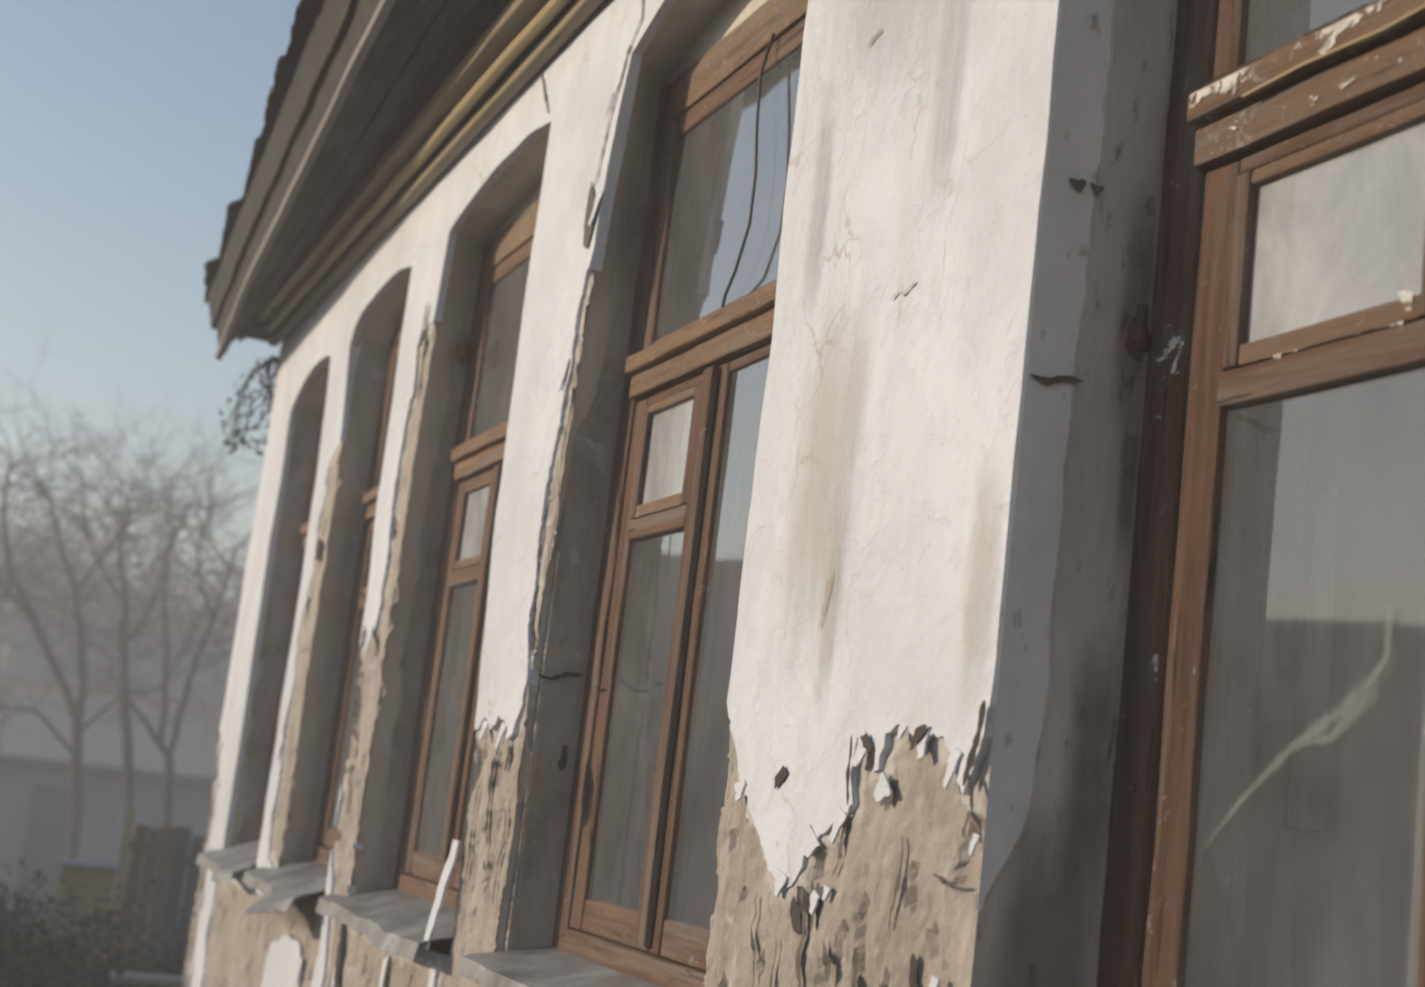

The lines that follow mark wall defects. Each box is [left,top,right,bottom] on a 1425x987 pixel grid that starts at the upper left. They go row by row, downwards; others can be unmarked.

spalling [181,270,594,987]
spalling [702,0,1184,987]
peeling [1189,0,1425,108]
peeling [1375,289,1412,329]